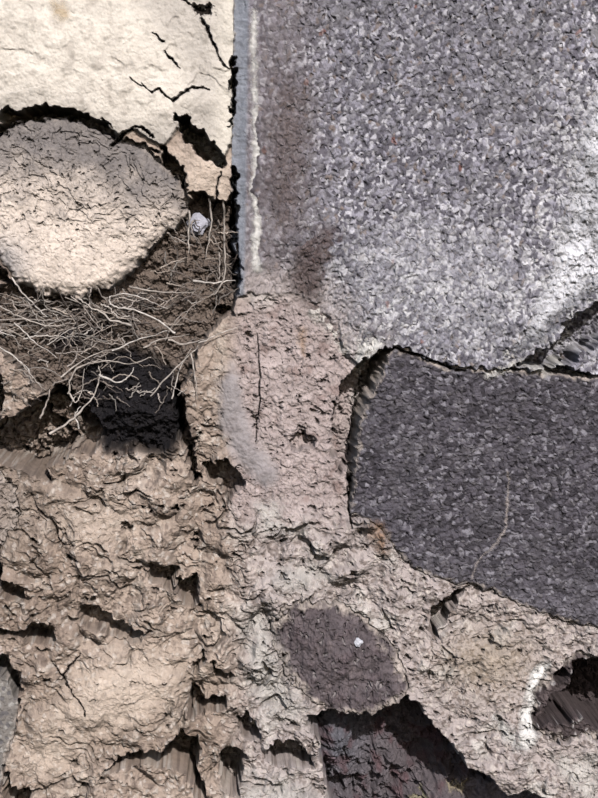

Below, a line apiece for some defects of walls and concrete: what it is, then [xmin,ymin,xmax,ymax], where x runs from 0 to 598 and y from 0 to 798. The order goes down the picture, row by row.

crack [152,33,179,68]
crack [182,0,230,70]
crack [130,77,210,102]
crack [102,119,159,153]
crack [393,346,465,372]
spalling [307,694,545,798]